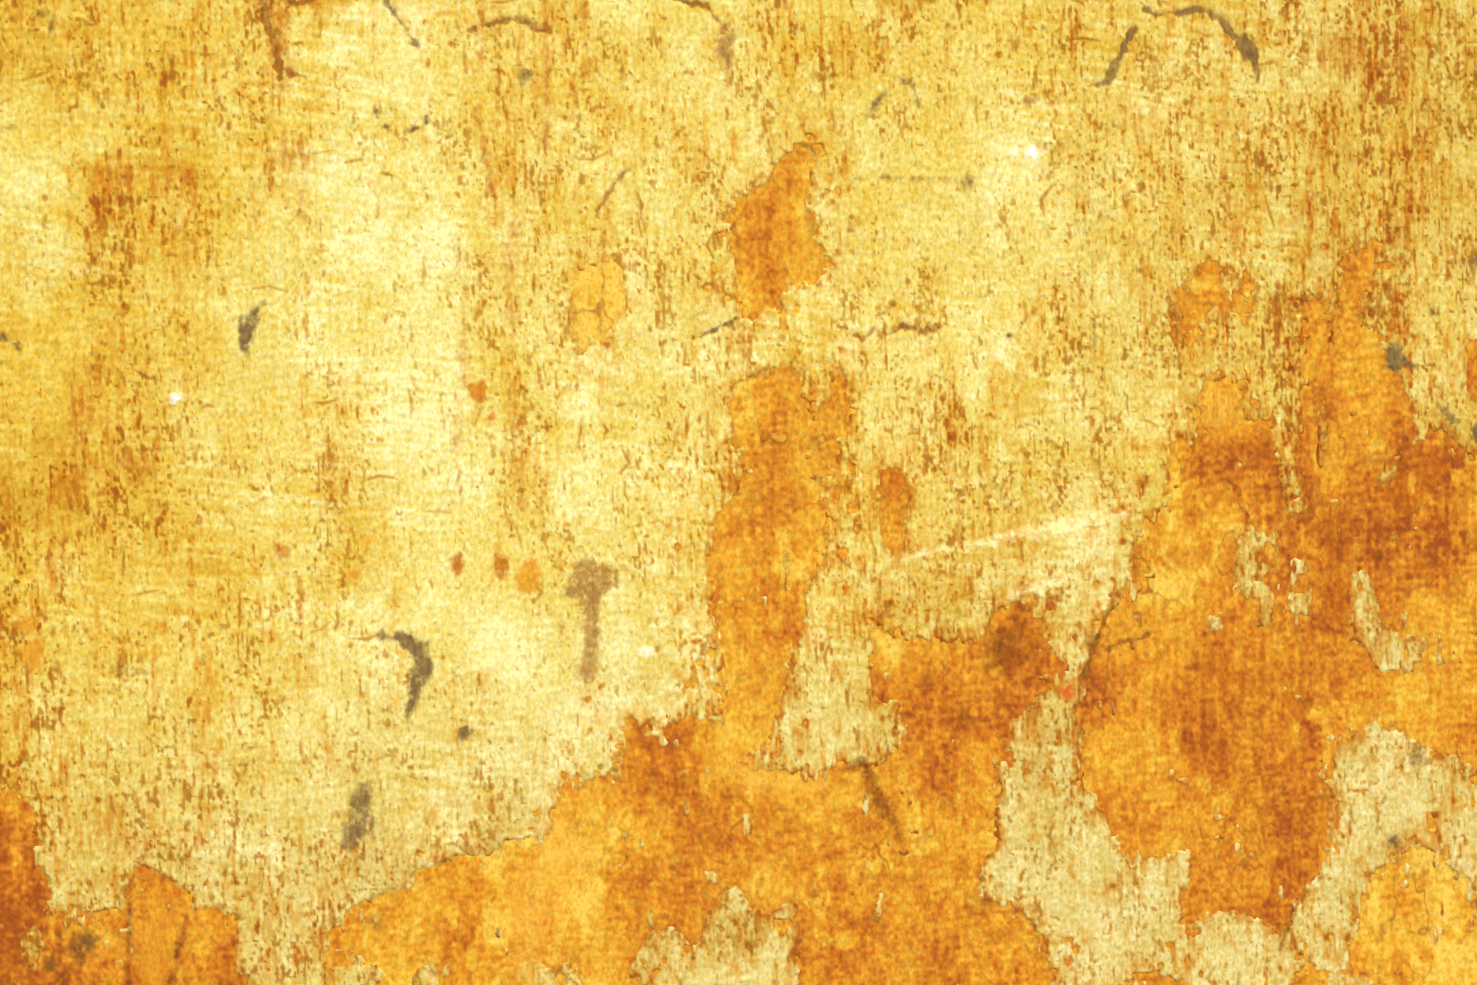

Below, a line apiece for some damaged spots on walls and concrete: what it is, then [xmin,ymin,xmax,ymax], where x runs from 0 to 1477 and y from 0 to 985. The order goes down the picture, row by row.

crack [259,0,313,81]
crack [384,0,419,46]
crack [468,17,552,34]
crack [679,0,727,30]
crack [1095,6,1260,87]
peeling [706,134,845,331]
peeling [319,218,1477,985]
peeling [0,762,250,985]